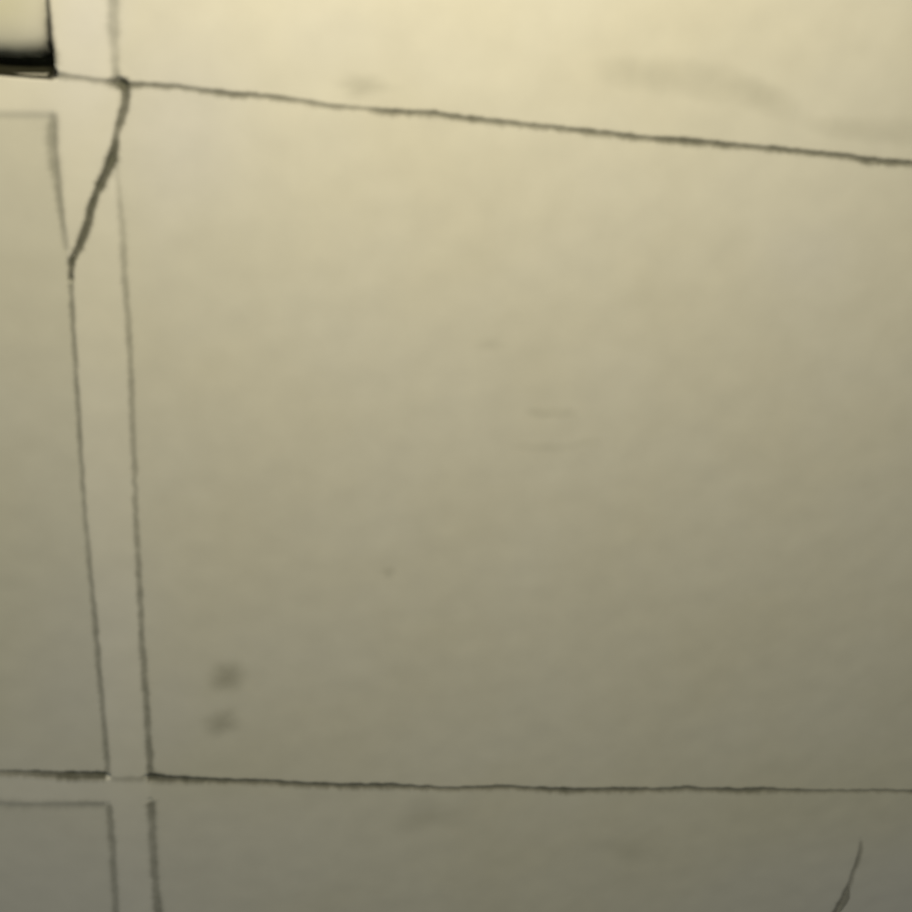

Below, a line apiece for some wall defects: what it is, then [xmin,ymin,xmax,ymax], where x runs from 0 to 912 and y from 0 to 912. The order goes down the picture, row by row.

crack [216,90,243,98]
crack [624,135,732,147]
crack [767,147,909,165]
crack [69,79,141,277]
crack [836,888,849,912]